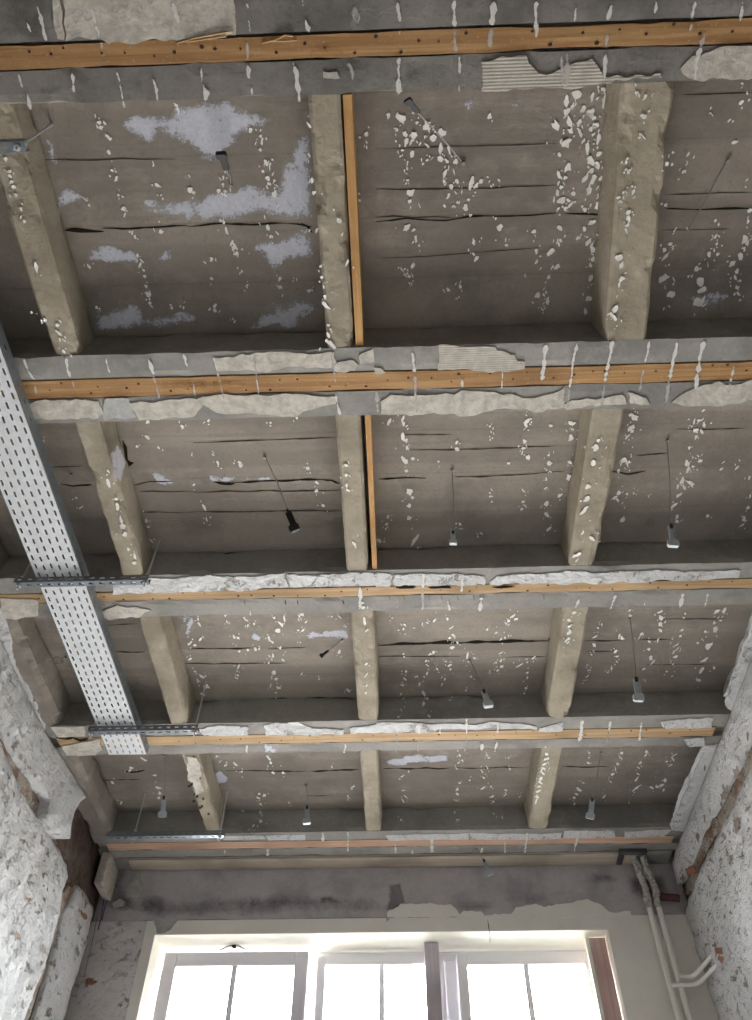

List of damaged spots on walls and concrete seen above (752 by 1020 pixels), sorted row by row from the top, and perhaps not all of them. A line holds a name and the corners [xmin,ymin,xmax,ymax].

damp [116,68,266,161]
crack [65,222,313,233]
damp [144,136,313,269]
crack [377,213,598,222]
peeling [616,157,636,234]
damp [90,246,138,263]
peeling [607,254,630,330]
damp [96,304,196,330]
crack [134,478,341,513]
crack [378,638,550,657]
peeling [0,608,46,729]
peeling [386,899,631,922]